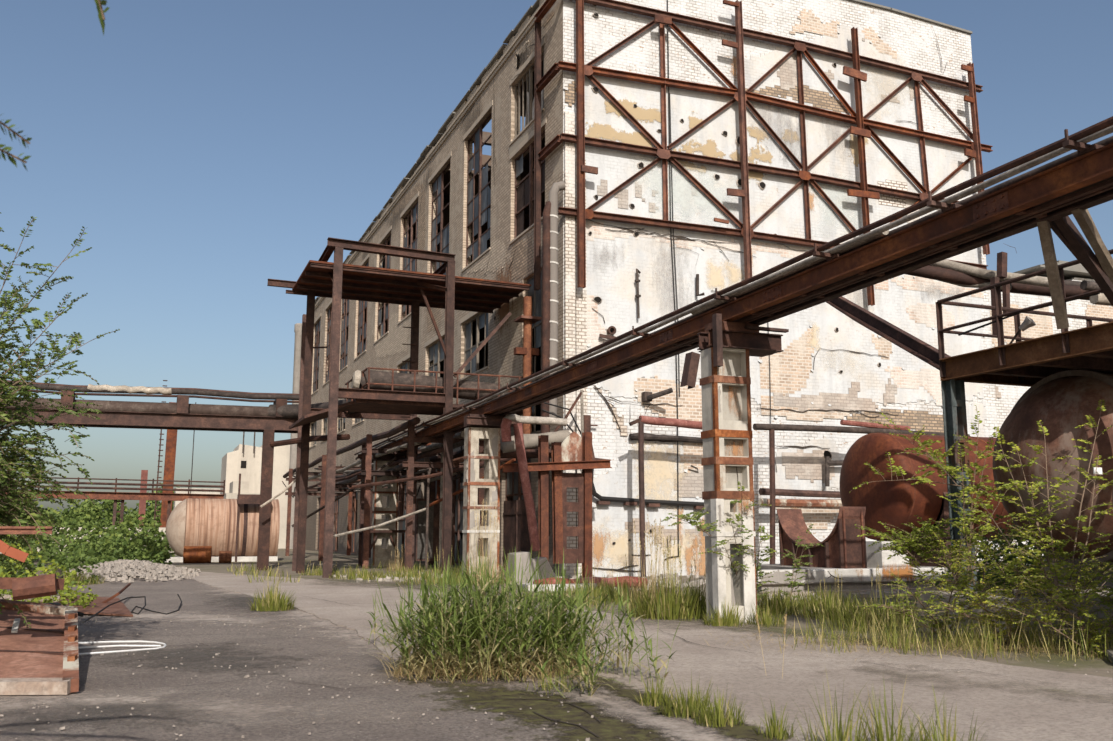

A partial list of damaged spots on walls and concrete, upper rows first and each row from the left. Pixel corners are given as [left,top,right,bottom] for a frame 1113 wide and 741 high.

flaking render [790,8,840,38]
flaking render [758,325,944,432]